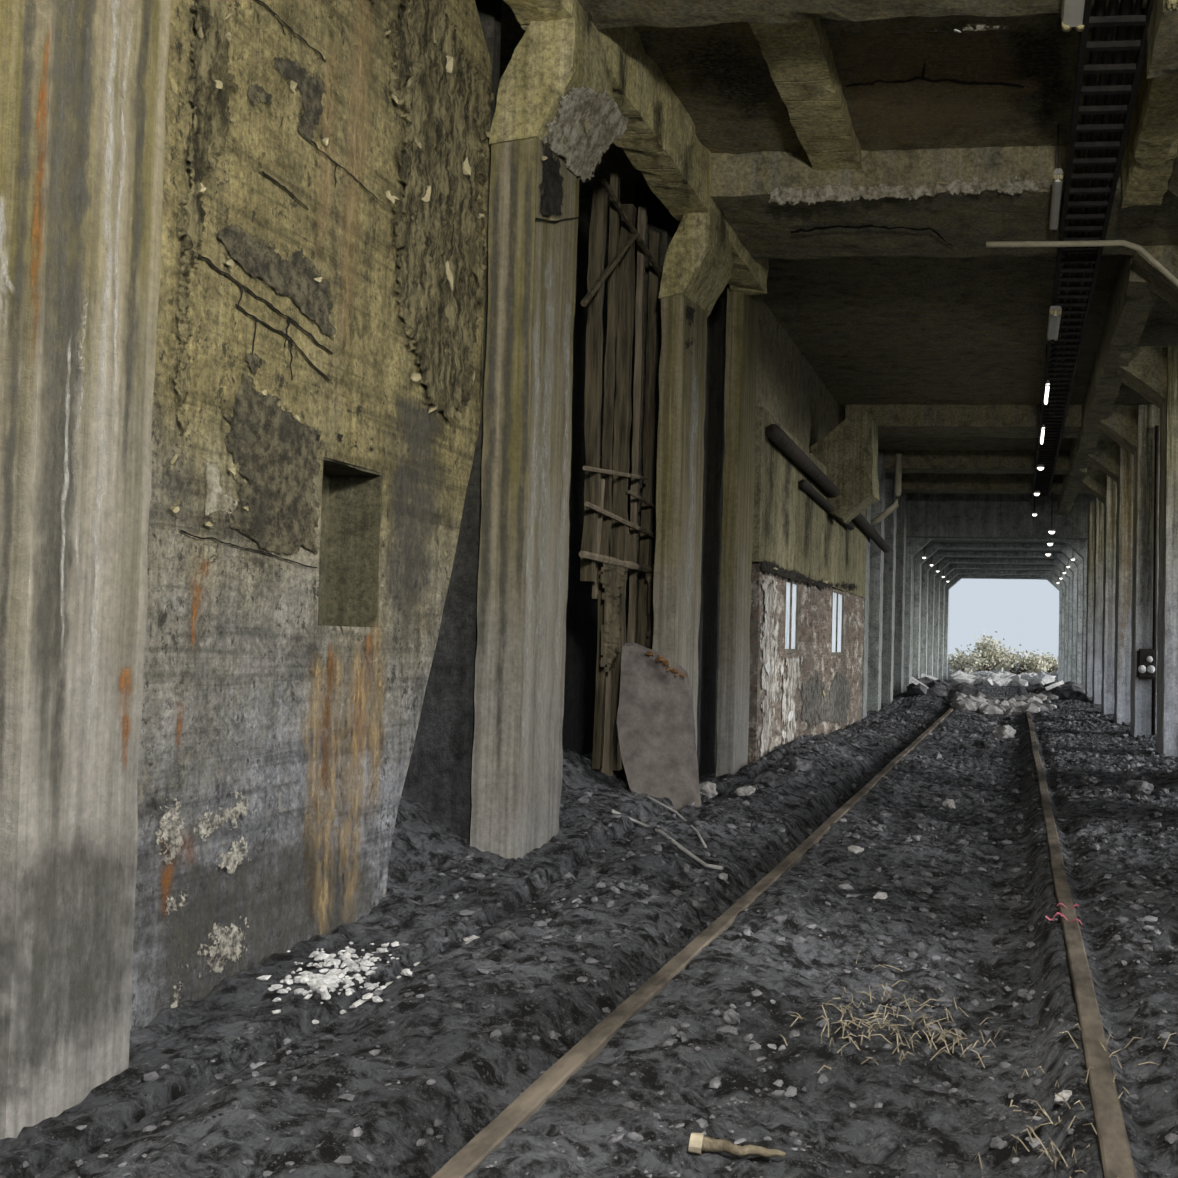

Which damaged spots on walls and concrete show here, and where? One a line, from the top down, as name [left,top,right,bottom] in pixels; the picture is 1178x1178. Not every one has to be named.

water stain [37,0,95,783]
water stain [101,0,150,441]
crack [180,530,317,568]
spalling [170,0,336,472]
peeling [204,352,324,555]
crack [198,254,333,381]
spalling [539,86,628,221]
crack [790,224,953,247]
crack [845,59,1024,88]
corrosion [305,627,382,923]
water stain [20,842,134,1066]
water stain [155,790,371,1008]